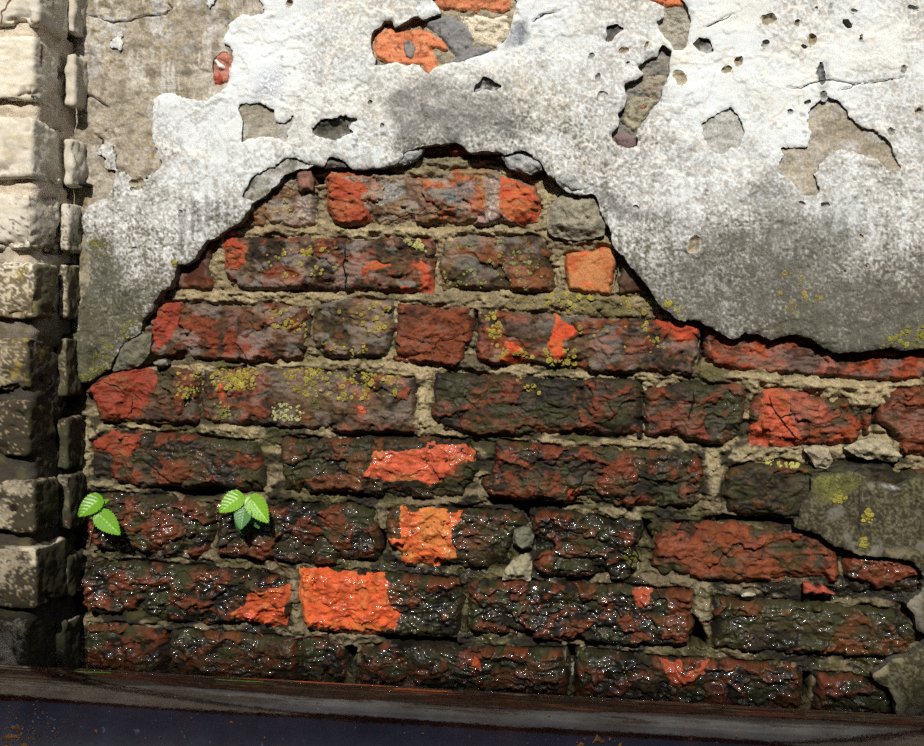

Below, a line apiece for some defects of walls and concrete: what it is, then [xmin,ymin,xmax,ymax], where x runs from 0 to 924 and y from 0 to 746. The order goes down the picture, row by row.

spalling [372,0,517,74]
peeling [606,24,624,42]
spalling [612,0,713,148]
crack [787,77,902,90]
peeling [67,0,264,305]
peeling [239,103,294,142]
peeling [313,116,358,140]
water stain [76,242,142,359]
spalling [67,143,924,714]